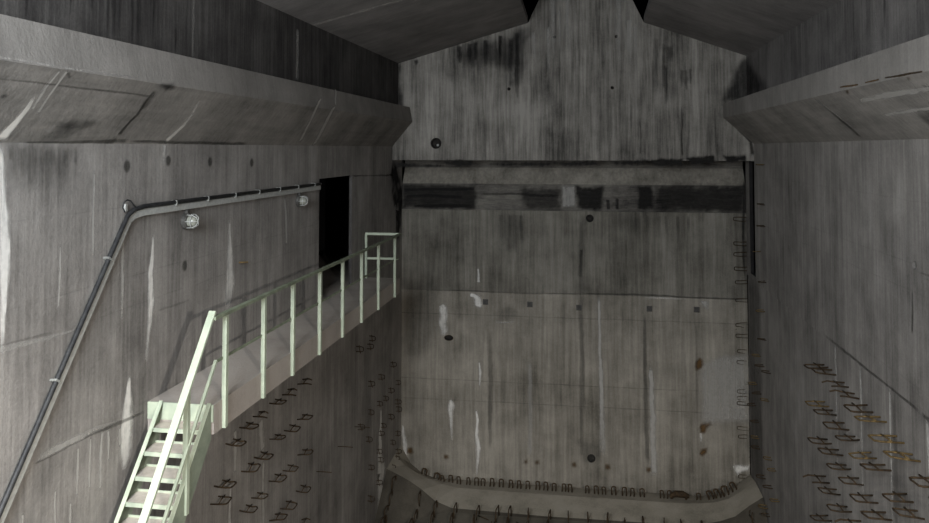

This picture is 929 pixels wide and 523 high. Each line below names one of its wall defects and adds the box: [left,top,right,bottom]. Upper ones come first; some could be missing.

water stain [459,32,523,71]
water stain [0,71,67,341]
water stain [439,305,447,333]